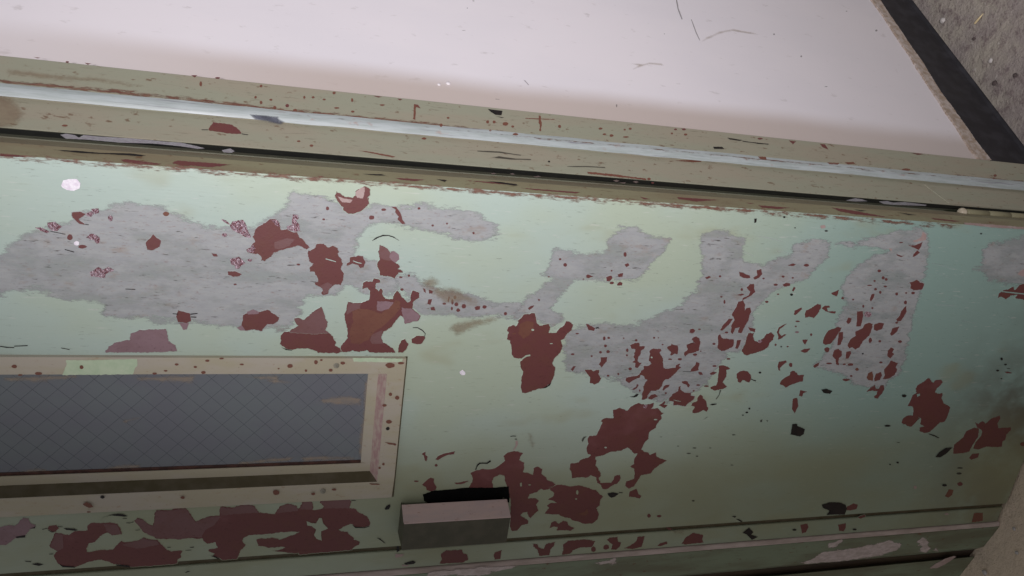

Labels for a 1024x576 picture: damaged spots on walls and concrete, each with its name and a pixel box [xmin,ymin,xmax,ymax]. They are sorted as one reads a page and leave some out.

peeling [997,269,1024,300]
peeling [0,173,930,568]
peeling [885,378,1011,498]
peeling [427,549,516,576]
peeling [917,537,956,569]